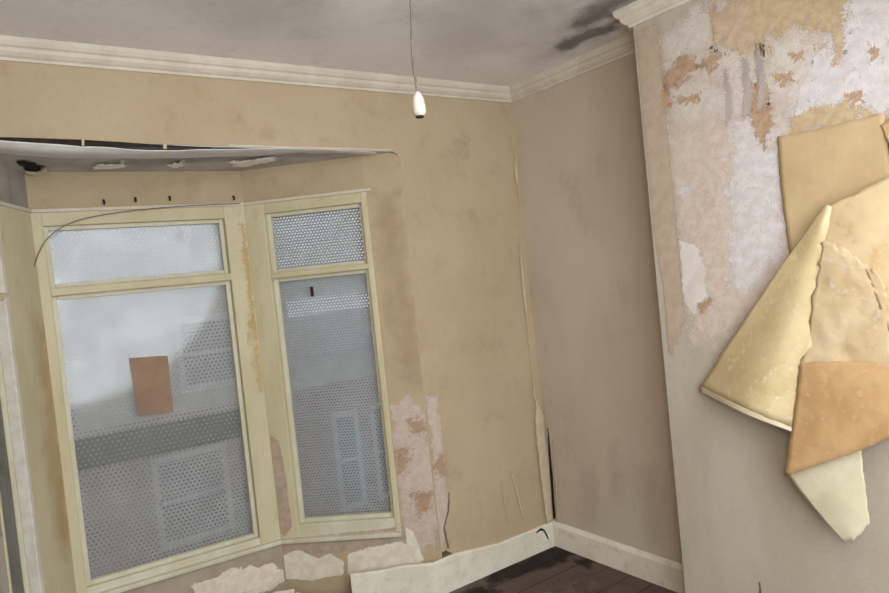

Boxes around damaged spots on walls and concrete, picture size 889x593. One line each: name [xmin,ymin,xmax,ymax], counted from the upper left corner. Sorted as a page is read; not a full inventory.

peeling [658,0,889,361]
peeling [191,394,438,593]